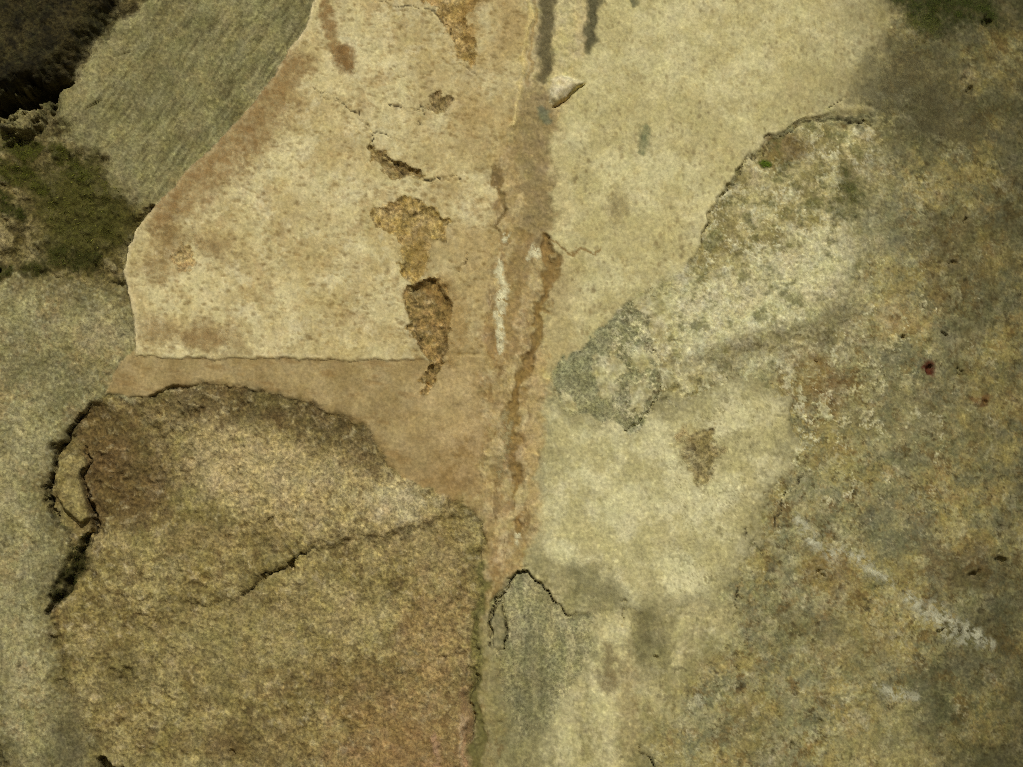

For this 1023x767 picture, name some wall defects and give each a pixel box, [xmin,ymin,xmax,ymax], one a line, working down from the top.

spalling [420,0,481,69]
spalling [367,140,426,181]
spalling [370,195,454,396]